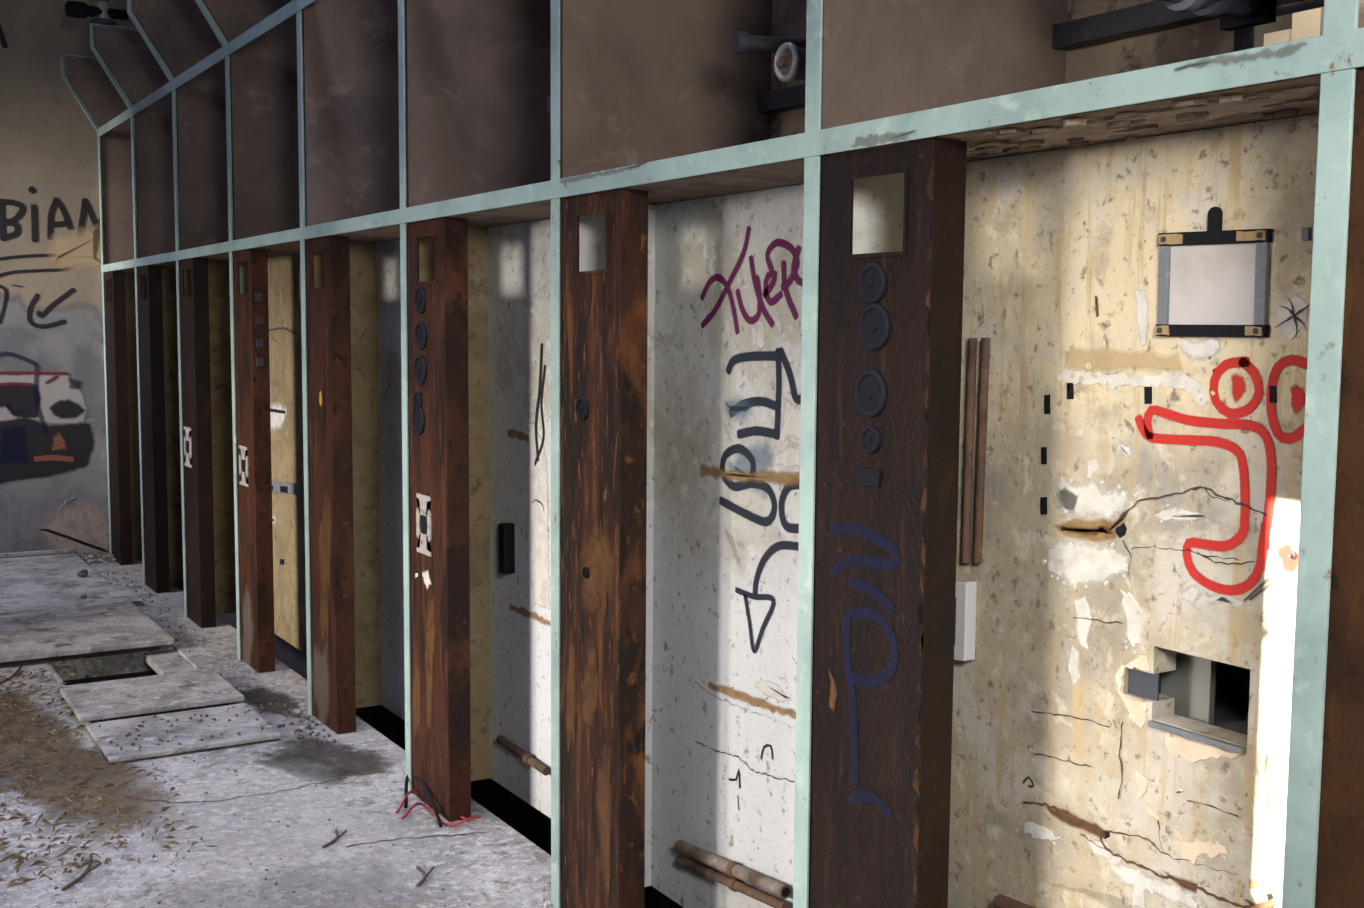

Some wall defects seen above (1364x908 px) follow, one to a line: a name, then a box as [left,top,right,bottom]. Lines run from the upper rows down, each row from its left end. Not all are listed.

peeling [1155,504,1204,523]
crack [1118,486,1268,587]
peeling [1042,460,1152,728]
peeling [1180,586,1244,608]
crack [1073,616,1123,624]
spalling [1165,732,1244,763]
crack [1022,711,1275,908]